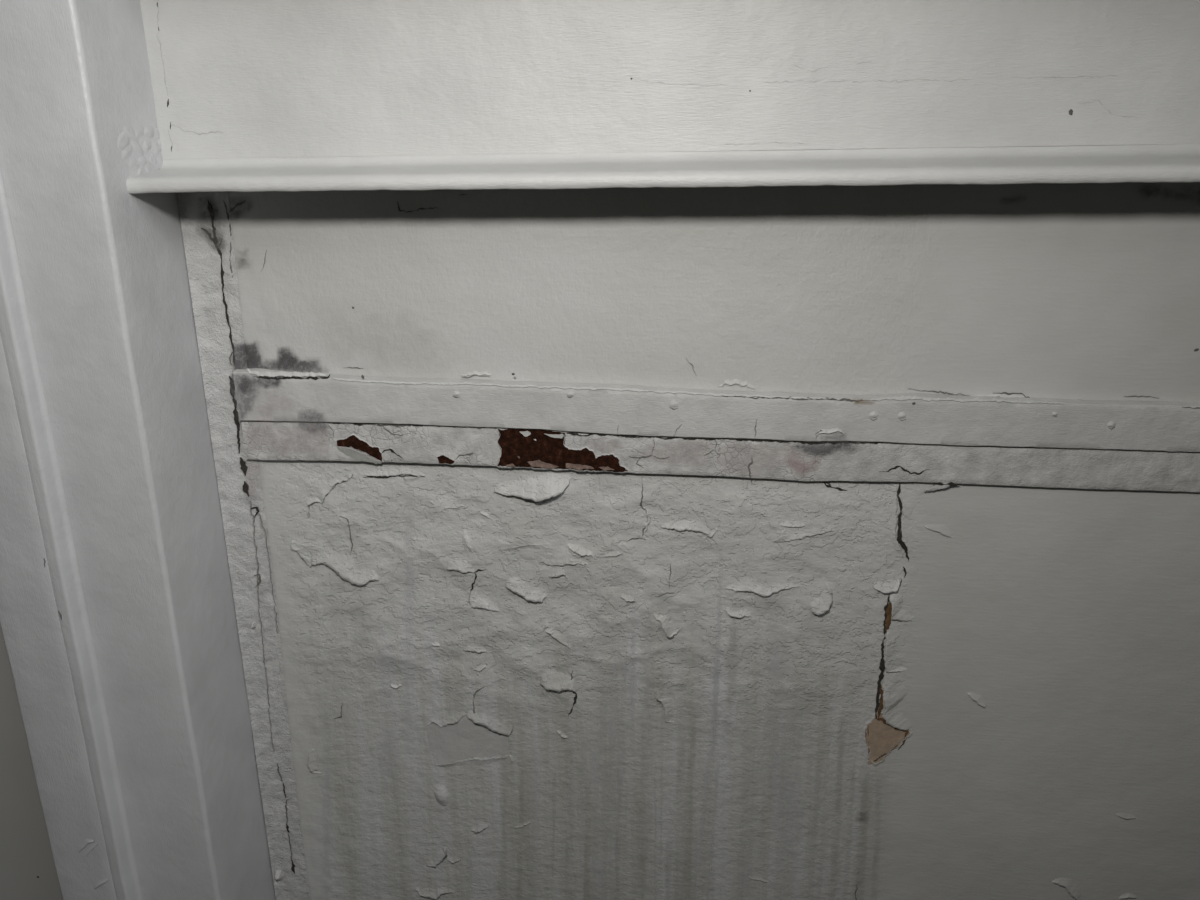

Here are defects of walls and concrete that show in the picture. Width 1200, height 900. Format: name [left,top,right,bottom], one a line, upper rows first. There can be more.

rust [336,434,403,464]
rust [496,428,629,473]
peeling [306,467,425,516]
peeling [494,473,570,502]
crack [201,200,295,874]
peeling [290,516,379,586]
peeling [498,543,623,602]
peeling [660,519,718,538]
peeling [726,582,800,618]
crack [875,466,929,719]
peeling [863,579,914,767]
peeling [427,686,514,767]